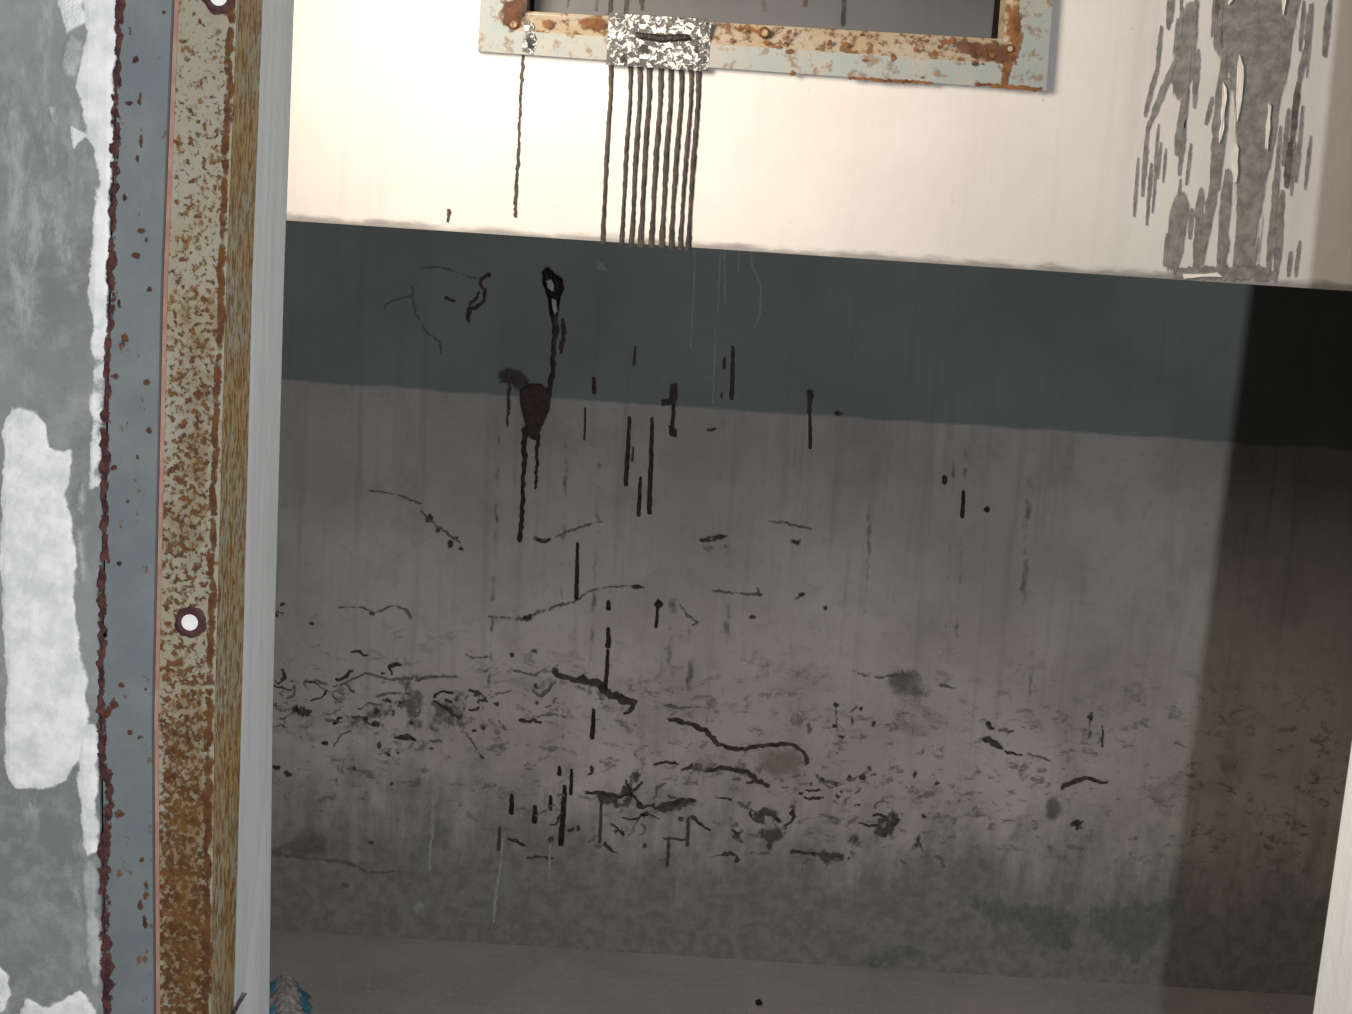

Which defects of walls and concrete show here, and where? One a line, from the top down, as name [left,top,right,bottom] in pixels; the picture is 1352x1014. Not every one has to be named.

rust [500,0,527,31]
leakage [513,21,537,218]
rust [578,17,606,30]
leakage [600,65,702,349]
rust [730,26,794,54]
rust [849,59,934,85]
rust [910,0,1042,92]
peeling [1133,0,1332,282]
peeling [0,0,117,1014]
rust [96,0,148,1014]
rust [138,0,236,1014]
crack [532,668,812,788]